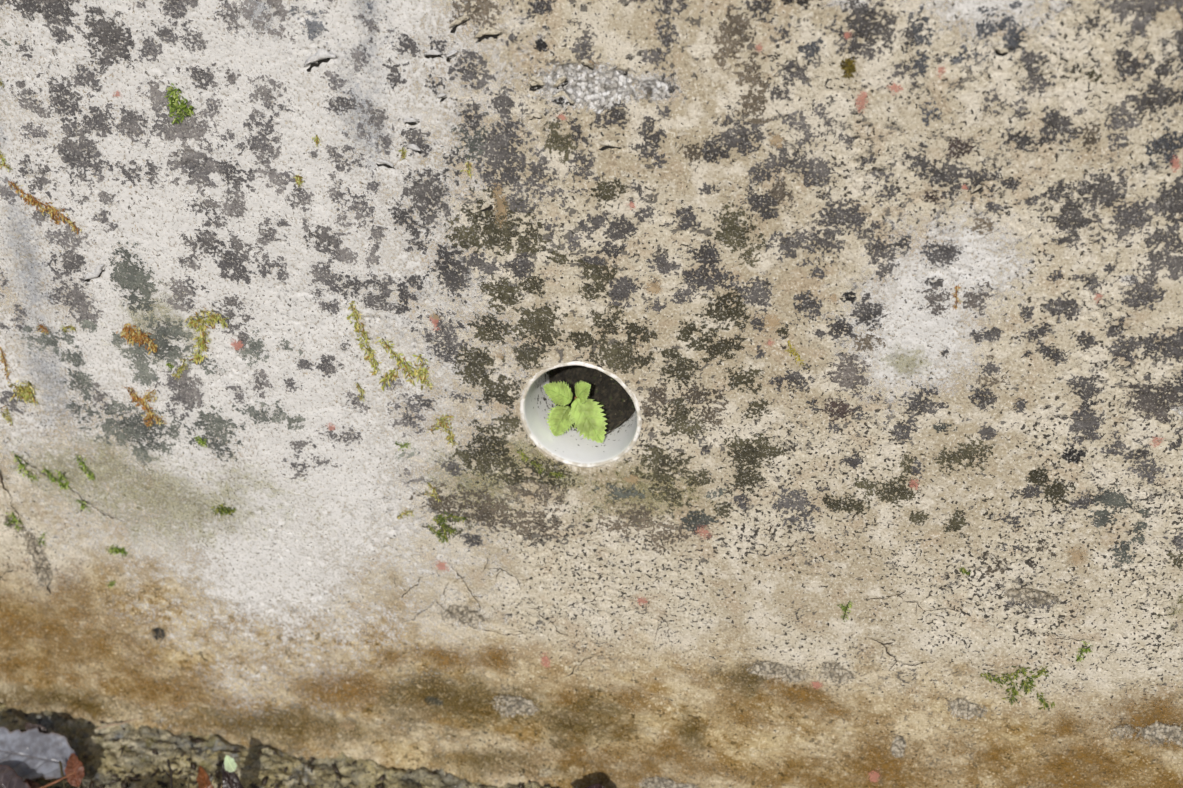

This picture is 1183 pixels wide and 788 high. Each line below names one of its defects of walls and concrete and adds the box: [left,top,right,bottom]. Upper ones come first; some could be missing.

spalling [521,58,676,120]
damp [0,0,710,775]
crack [0,457,128,594]
damp [730,664,845,725]
damp [757,748,935,788]
damp [1000,719,1183,788]
damp [1121,700,1183,748]